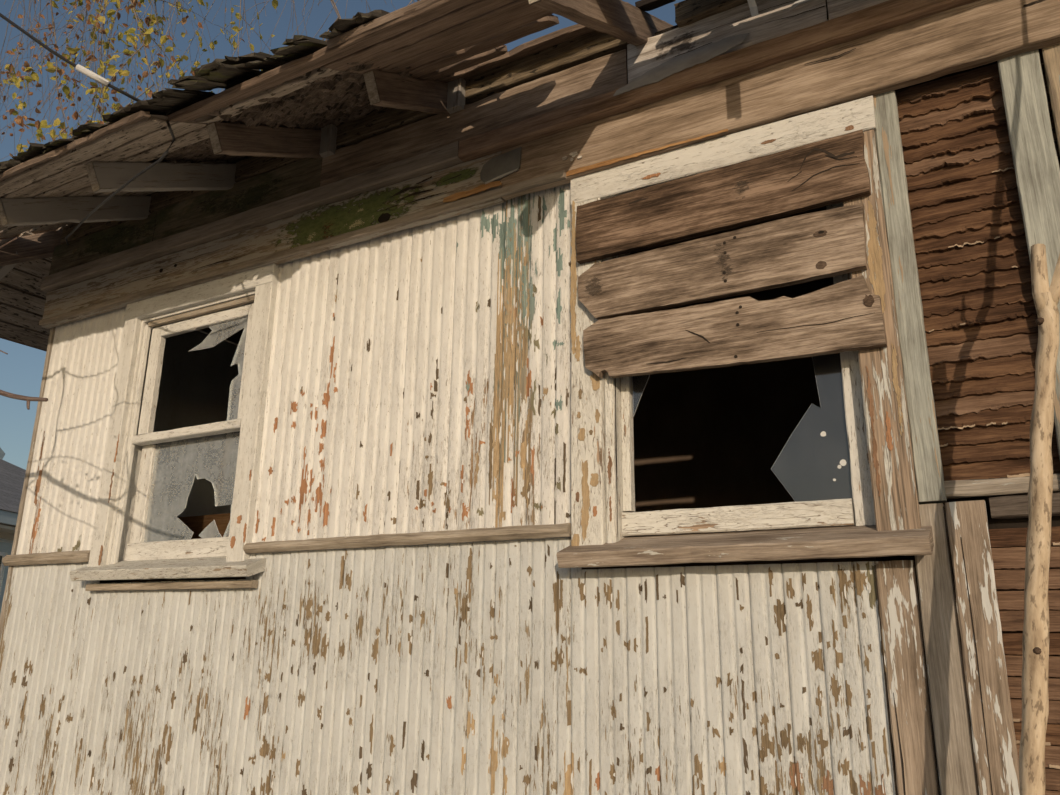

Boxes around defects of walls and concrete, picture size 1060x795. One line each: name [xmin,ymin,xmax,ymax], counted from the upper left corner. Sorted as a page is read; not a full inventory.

crack [788,148,859,191]
peeling [415,188,612,546]
peeling [230,336,338,549]
peeling [3,657,33,795]
peeling [240,735,307,795]
peeling [255,598,348,675]
peeling [446,548,510,795]
peeling [520,571,587,675]
peeling [550,742,620,795]
peeling [578,572,649,654]
peeling [639,572,685,603]
peeling [707,561,889,795]